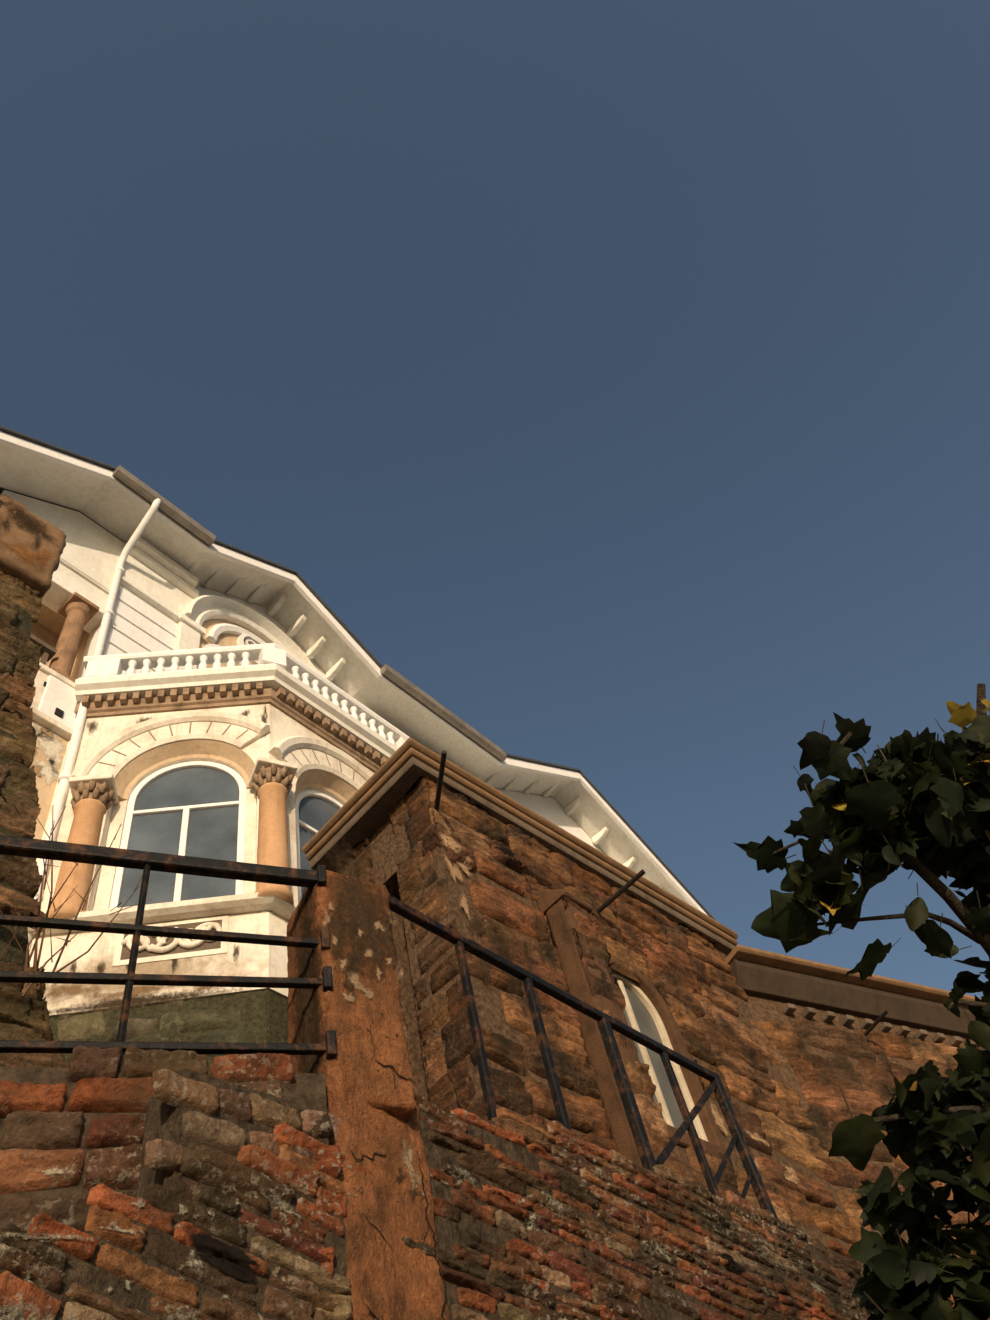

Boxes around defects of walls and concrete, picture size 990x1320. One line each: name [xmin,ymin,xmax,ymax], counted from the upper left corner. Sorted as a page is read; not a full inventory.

crack [0,707,22,717]
crack [370,1024,413,1089]
spalling [190,1233,258,1282]
crack [351,1148,446,1320]